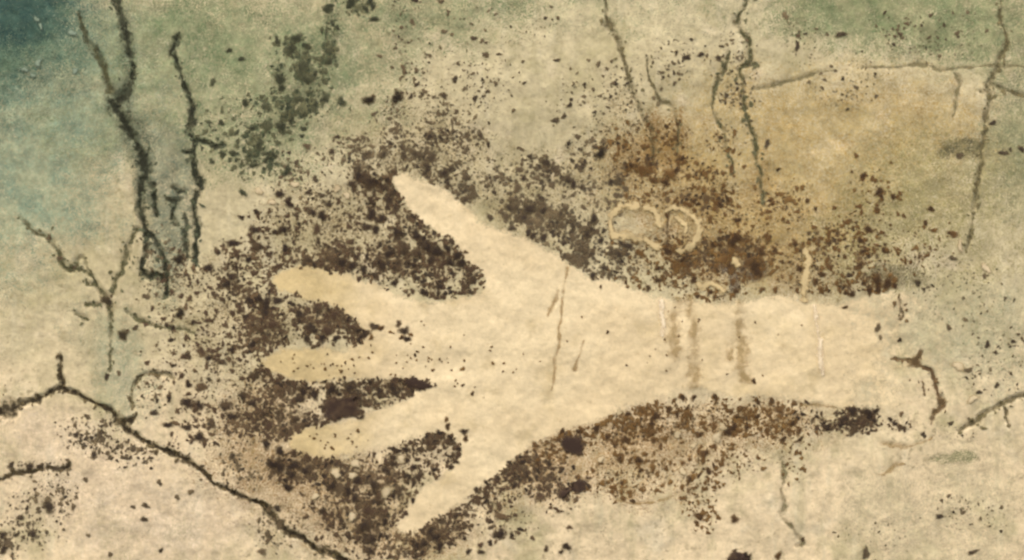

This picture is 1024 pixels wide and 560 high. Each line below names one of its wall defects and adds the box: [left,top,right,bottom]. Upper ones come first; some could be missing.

crack [17,0,226,374]
crack [600,0,682,164]
crack [712,0,836,205]
crack [861,0,1024,253]
crack [0,353,348,560]
crack [882,350,1024,475]